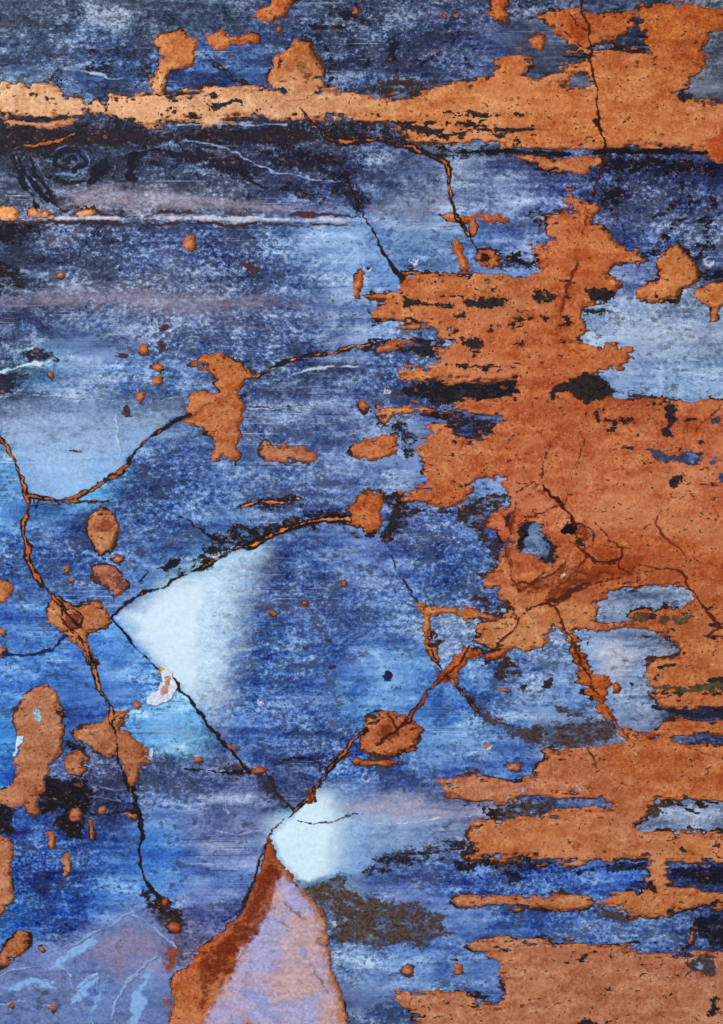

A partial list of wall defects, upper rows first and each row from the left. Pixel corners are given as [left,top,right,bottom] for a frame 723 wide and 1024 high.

crack [23,131,77,148]
crack [0,172,406,280]
peeling [0,0,723,176]
crack [299,0,708,310]
peeling [183,352,271,466]
crack [255,343,372,378]
peeling [338,187,723,920]
peeling [0,667,177,817]
crack [0,398,218,900]
crack [110,496,479,922]
peeling [168,833,349,1024]
peeling [391,929,723,1024]